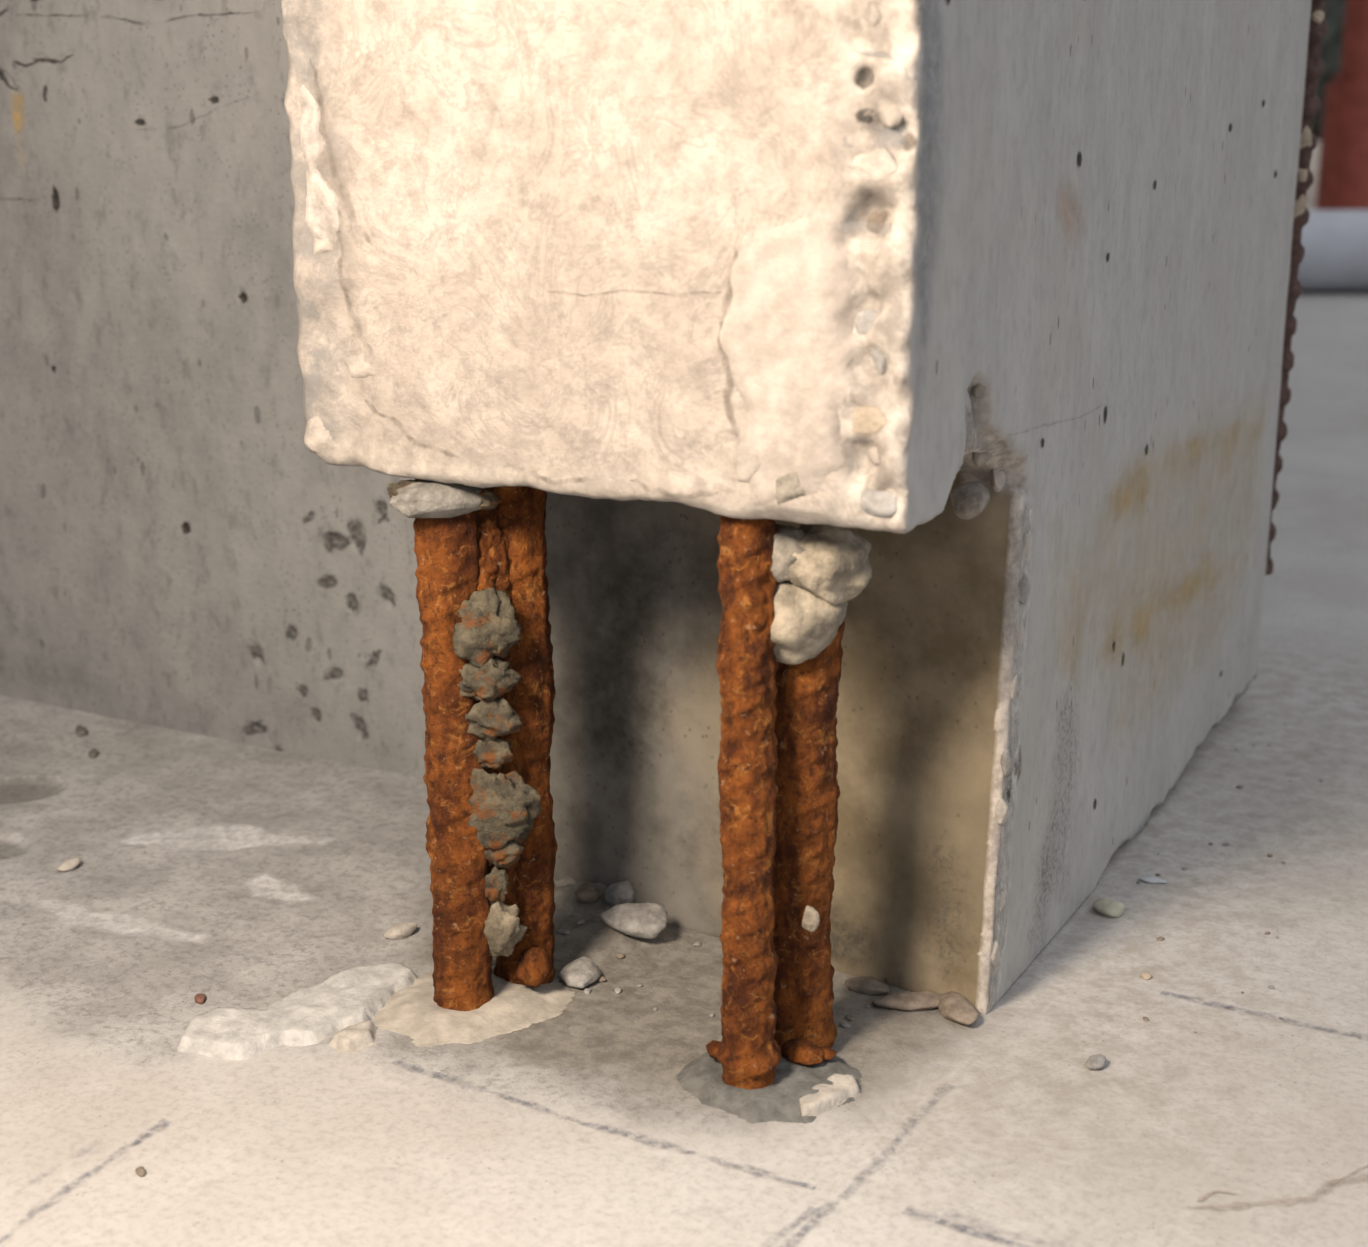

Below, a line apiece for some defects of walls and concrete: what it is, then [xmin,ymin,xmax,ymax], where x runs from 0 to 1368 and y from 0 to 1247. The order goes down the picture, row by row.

crack [0,54,73,102]
peeling [378,480,417,522]
peeling [478,488,502,510]
corrosion [477,507,516,615]
corrosion [494,653,517,711]
spalling [995,507,1032,825]
corrosion [486,732,524,776]
corrosion [487,843,522,918]
spalling [990,848,1010,1004]
corrosion [514,942,552,987]
corrosion [706,1040,721,1059]
crack [1197,1165,1368,1210]